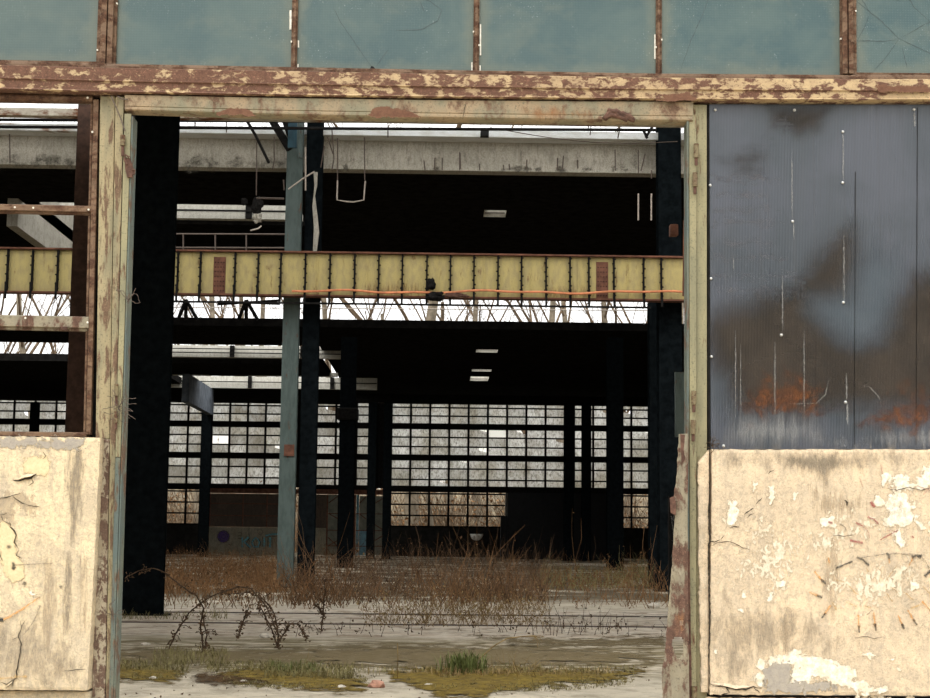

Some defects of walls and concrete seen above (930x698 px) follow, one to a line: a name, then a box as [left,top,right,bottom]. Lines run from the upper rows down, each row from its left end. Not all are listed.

rust [875,84,930,93]
spalling [0,434,86,477]
crack [0,452,46,561]
peeling [0,521,25,583]
peeling [716,465,930,621]
peeling [750,649,891,698]